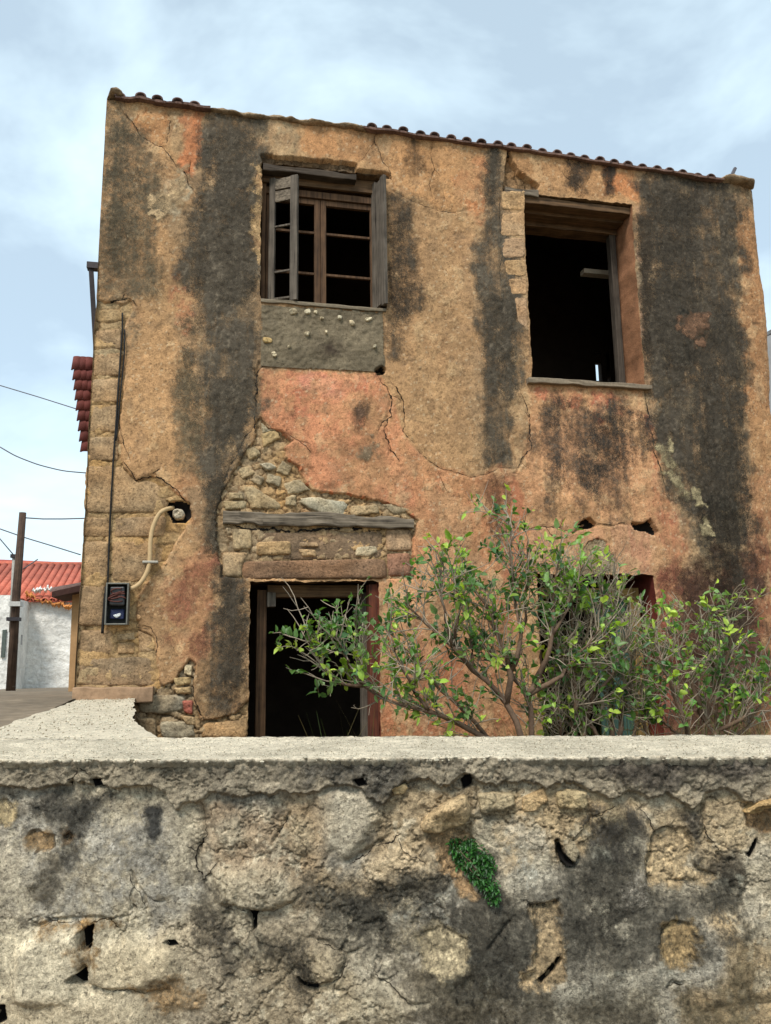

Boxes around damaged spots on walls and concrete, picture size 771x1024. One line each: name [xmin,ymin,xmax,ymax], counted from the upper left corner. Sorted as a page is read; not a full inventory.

crack [120,107,196,196]
crack [120,428,185,501]
flaking render [76,301,249,738]
damp [98,100,270,716]
flaking render [216,419,417,579]
crack [376,374,532,489]
damp [469,148,529,547]
damp [528,172,771,736]
damp [61,795,93,867]
damp [563,815,650,946]
damp [701,865,749,947]